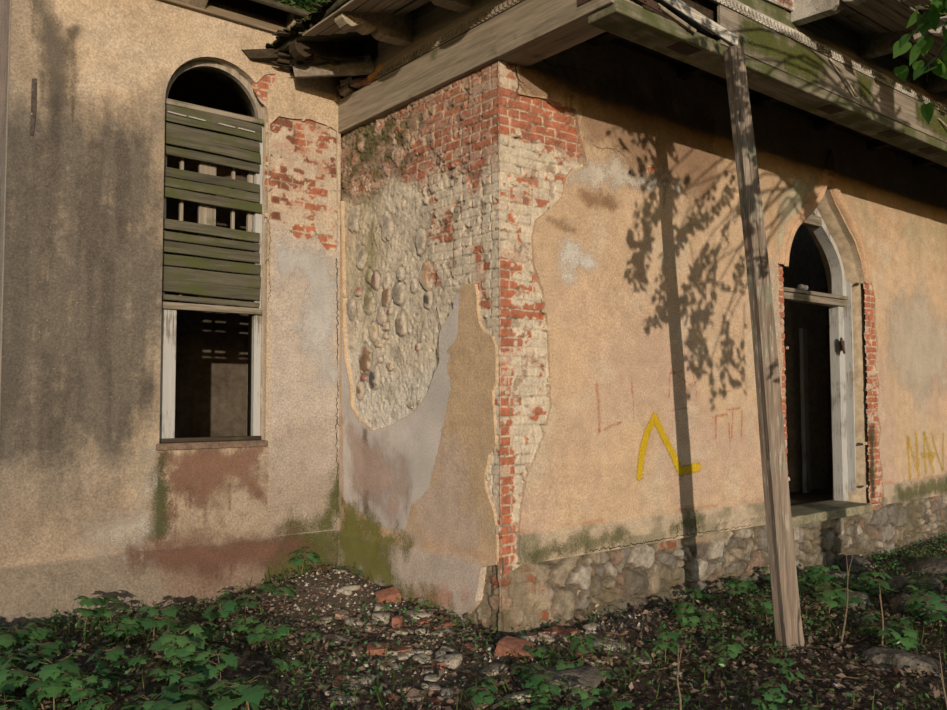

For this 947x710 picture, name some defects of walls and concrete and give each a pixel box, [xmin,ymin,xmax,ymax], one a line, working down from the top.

damp [39,0,78,108]
spalling [252,74,275,107]
peeling [778,175,816,251]
spalling [263,60,660,637]
spalling [770,263,790,481]
spalling [860,281,882,510]
damp [96,446,171,543]
damp [265,477,445,615]
damp [526,528,630,564]
damp [670,509,704,534]